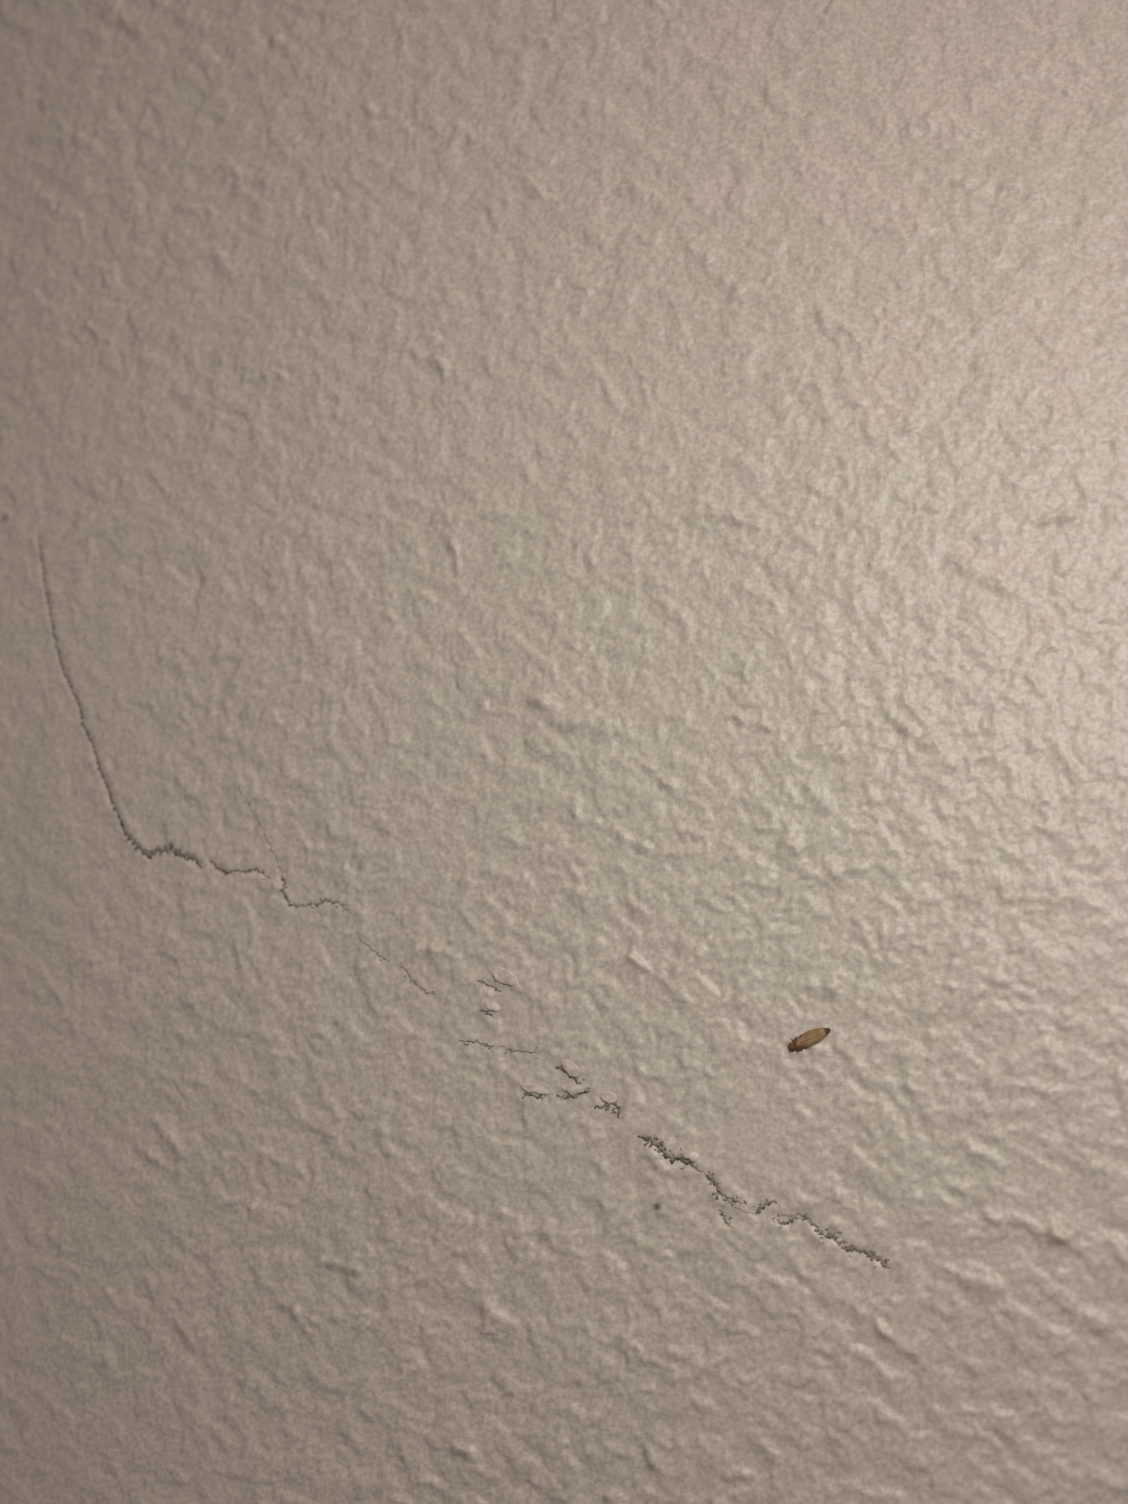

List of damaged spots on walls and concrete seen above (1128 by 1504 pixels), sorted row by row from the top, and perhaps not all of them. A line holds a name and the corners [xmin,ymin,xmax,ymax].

crack [39,535,436,995]
crack [459,967,896,1270]